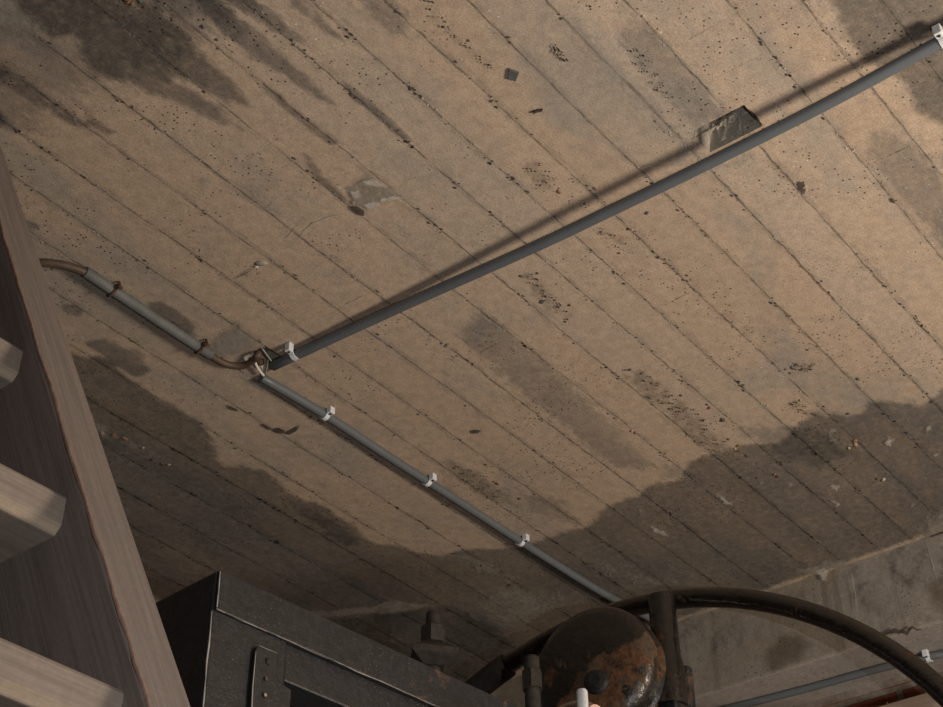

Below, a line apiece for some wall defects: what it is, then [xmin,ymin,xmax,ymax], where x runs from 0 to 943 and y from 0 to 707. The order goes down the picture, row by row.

spalling [691,105,763,152]
water stain [311,600,430,617]